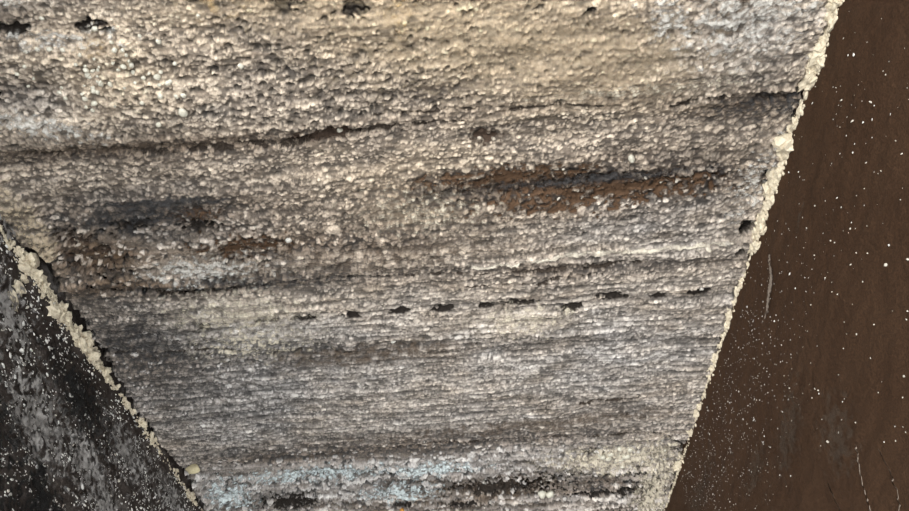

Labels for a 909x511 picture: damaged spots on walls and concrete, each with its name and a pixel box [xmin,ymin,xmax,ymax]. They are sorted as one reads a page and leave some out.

rust [402,159,751,228]
crack [99,274,244,294]
damp [204,459,496,511]
damp [534,436,682,511]